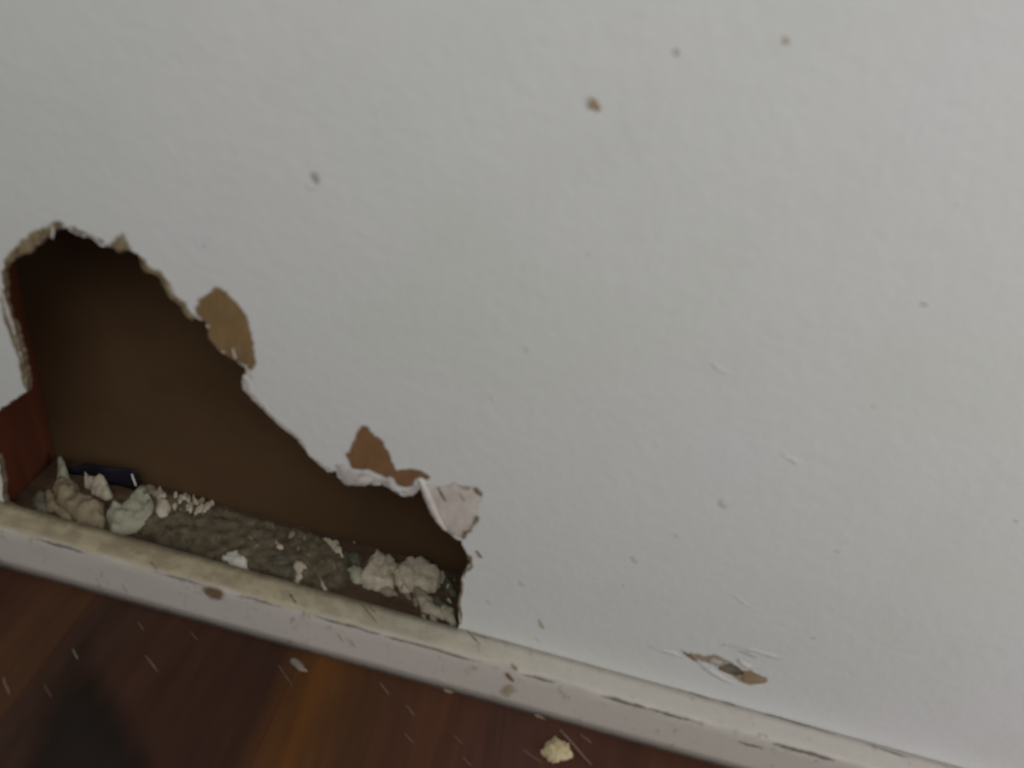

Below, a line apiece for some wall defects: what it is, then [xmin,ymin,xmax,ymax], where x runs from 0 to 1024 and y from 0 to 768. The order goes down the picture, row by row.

peeling [196,288,256,370]
spalling [346,426,482,539]
peeling [203,588,222,600]
spalling [650,644,784,685]